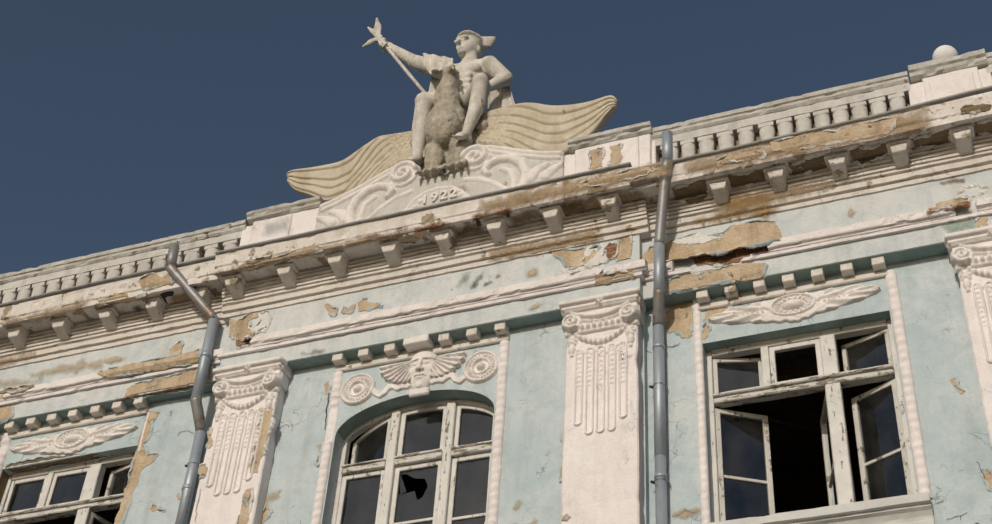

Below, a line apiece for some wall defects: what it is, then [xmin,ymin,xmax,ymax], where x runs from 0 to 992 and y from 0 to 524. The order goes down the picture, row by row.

peeling [960,103,992,137]
flaking render [474,106,935,340]
flaking render [229,310,273,350]
peeling [324,297,384,318]
flaking render [97,340,215,399]
flaking render [0,384,34,437]
flaking render [249,407,275,473]
spalling [0,453,113,503]
peeling [114,411,160,524]
flaking render [235,487,274,524]